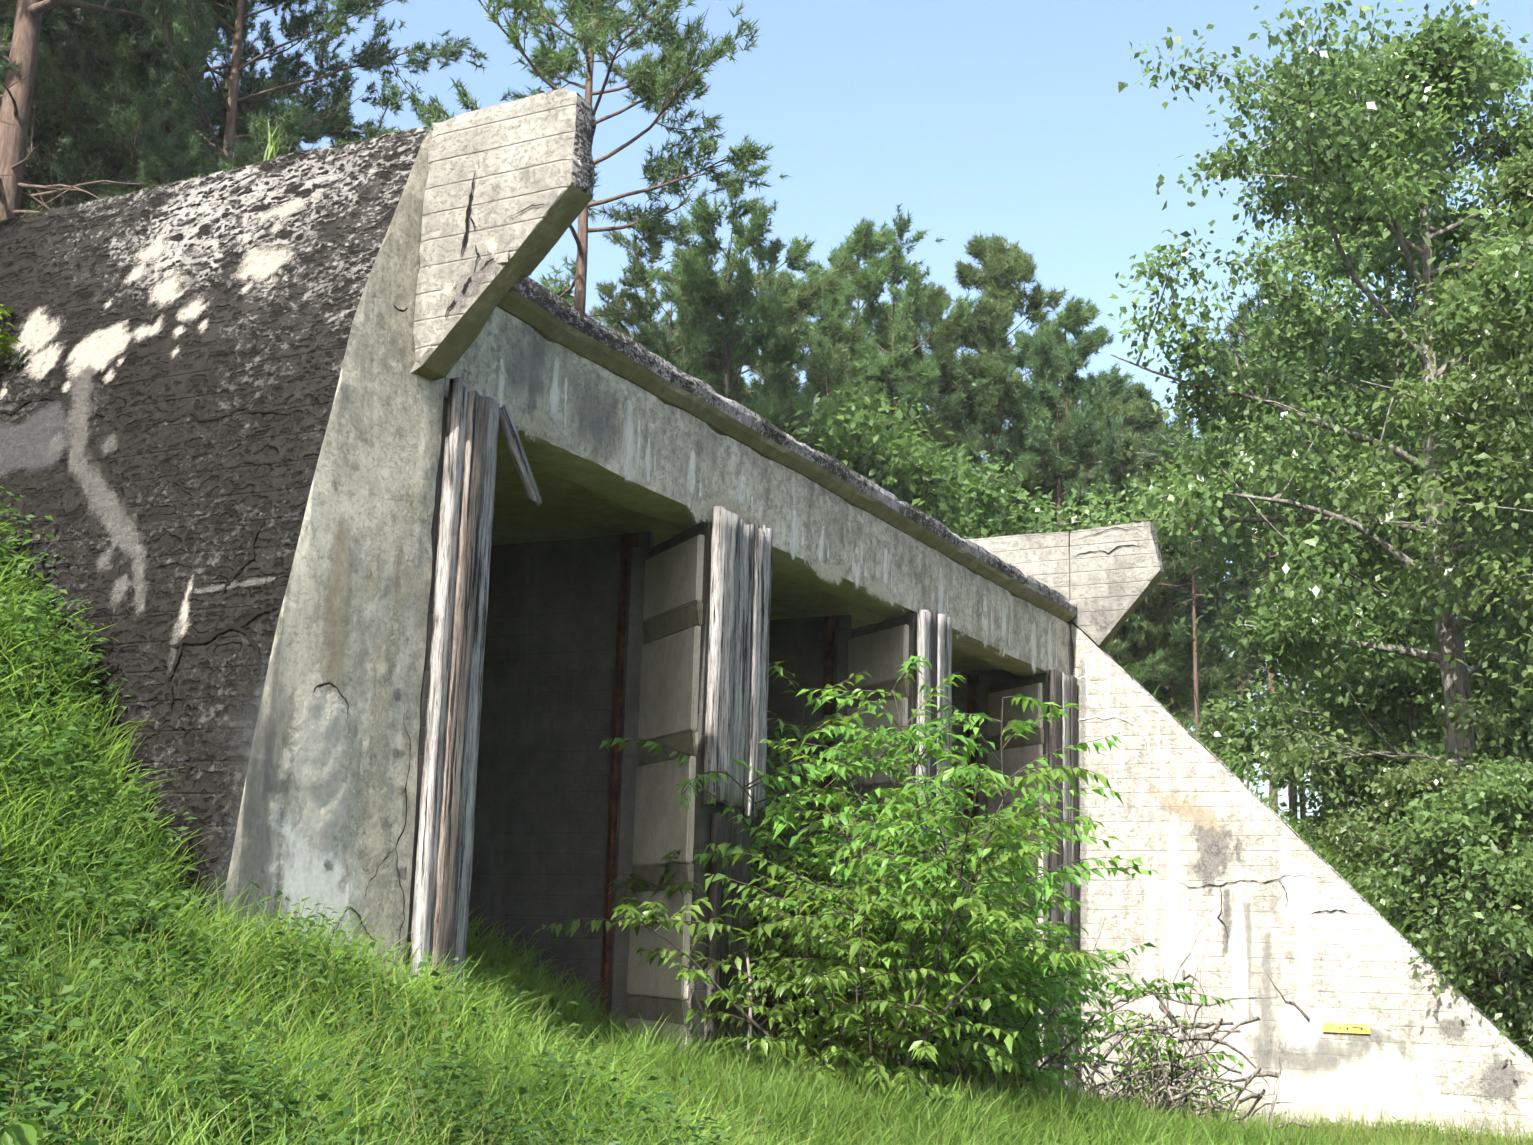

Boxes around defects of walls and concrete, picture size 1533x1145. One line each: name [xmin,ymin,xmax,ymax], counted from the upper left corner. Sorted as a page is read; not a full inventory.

water stain [498,340,656,483]
water stain [686,450,702,509]
water stain [790,508,829,563]
water stain [852,547,893,590]
water stain [981,596,1010,656]
water stain [1029,619,1058,673]
water stain [222,620,355,964]
crack [327,708,411,973]
water stain [1078,658,1109,950]
water stain [1148,821,1196,1081]
crack [1178,875,1349,944]
water stain [1232,870,1416,1085]